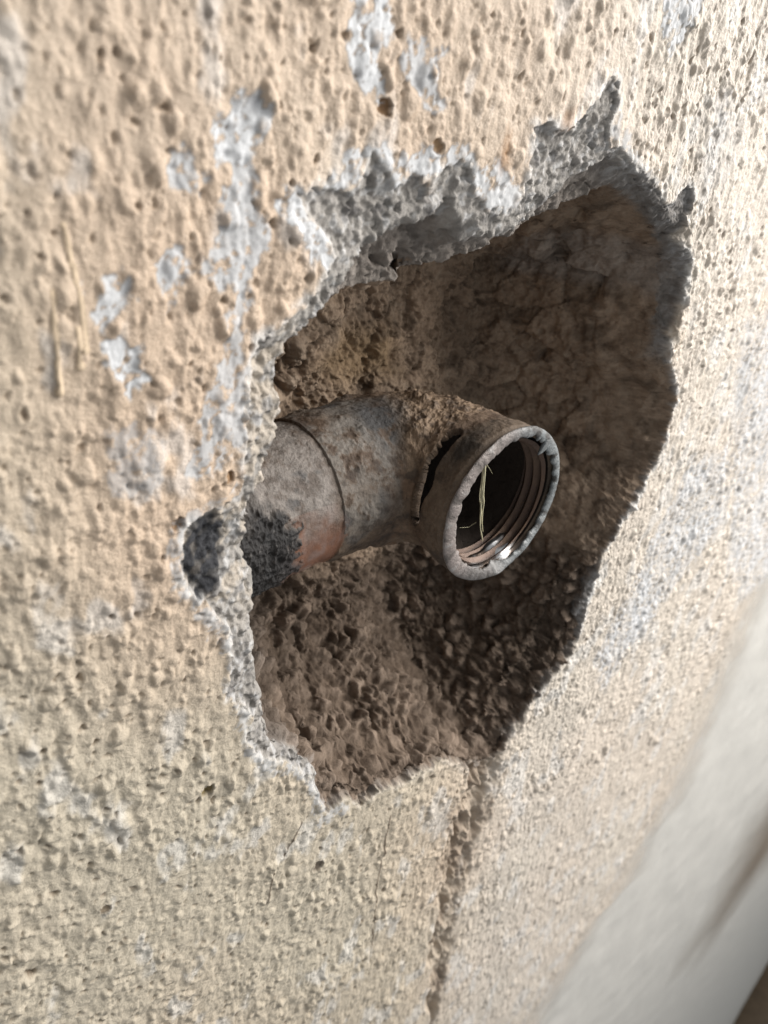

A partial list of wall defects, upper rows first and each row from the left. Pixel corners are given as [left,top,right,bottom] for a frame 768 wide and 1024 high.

spalling [166,76,695,814]